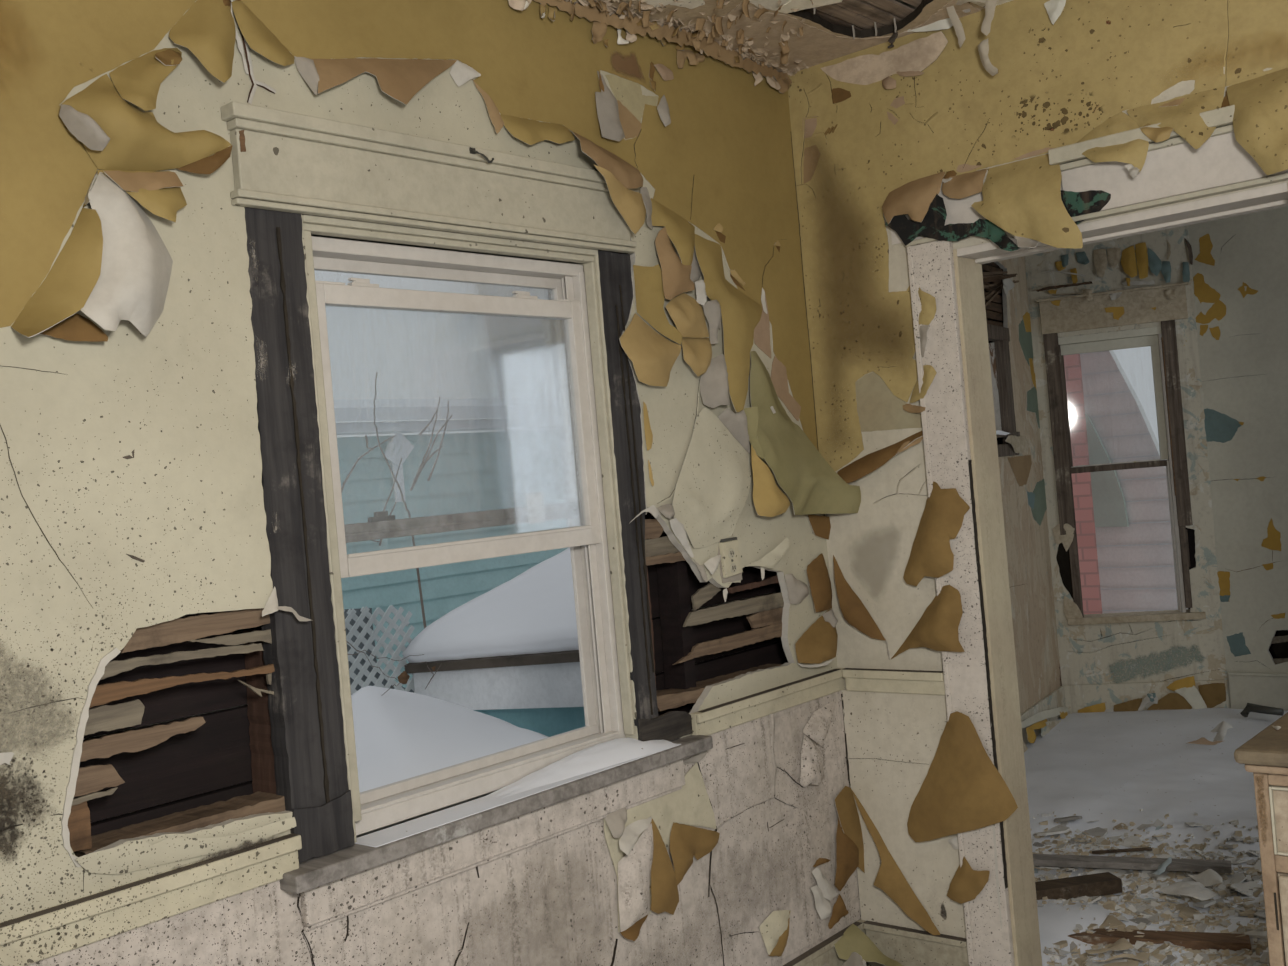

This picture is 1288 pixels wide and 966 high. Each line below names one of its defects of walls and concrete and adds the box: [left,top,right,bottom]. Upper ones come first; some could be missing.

crack [230,0,276,104]
peeling [508,0,1013,141]
peeling [1044,0,1066,25]
peeling [1040,233,1226,340]
peeling [1199,388,1244,443]
crack [0,425,93,608]
hole [630,504,809,711]
spalling [1271,613,1288,665]
damp [0,630,80,861]
hole [61,586,312,875]
crack [454,922,470,966]
crack [610,939,619,966]